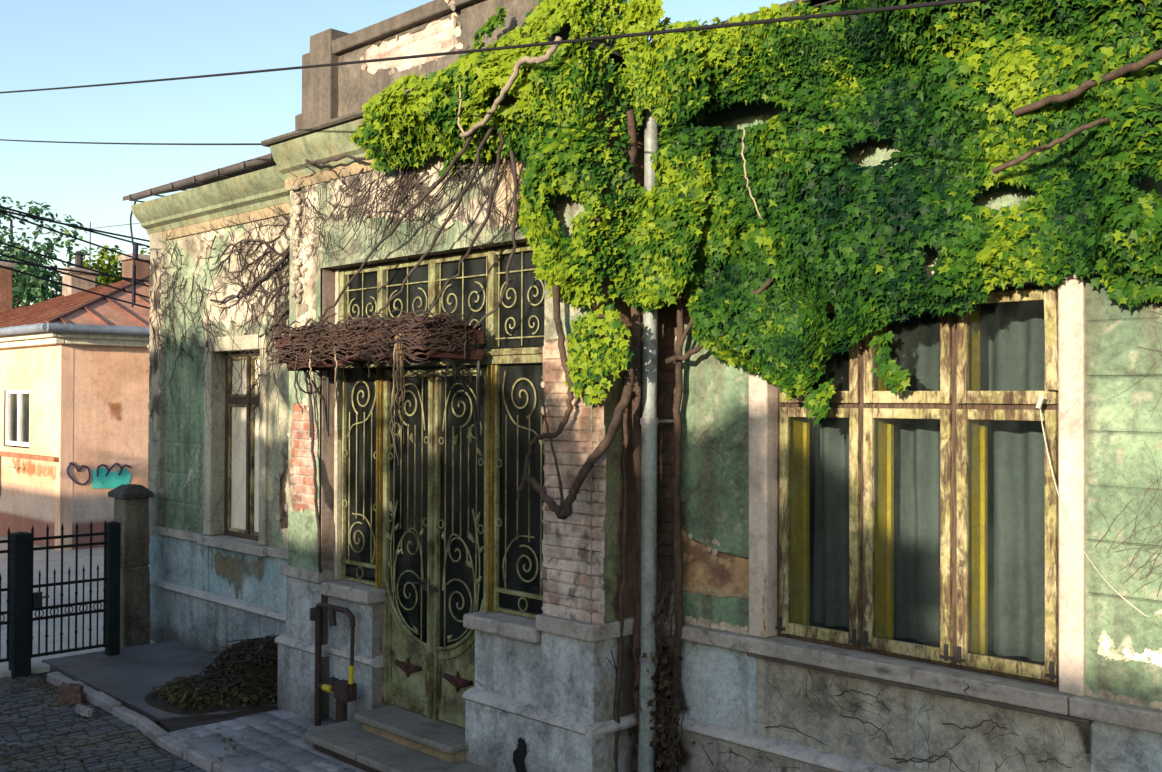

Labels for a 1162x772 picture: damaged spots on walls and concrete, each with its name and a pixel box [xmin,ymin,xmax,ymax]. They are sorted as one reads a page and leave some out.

flaking render [360,0,463,75]
flaking render [147,142,526,434]
flaking render [276,398,320,533]
flaking render [656,287,767,638]
water stain [211,551,263,598]
peeling [1097,630,1162,667]
spalling [513,737,530,772]